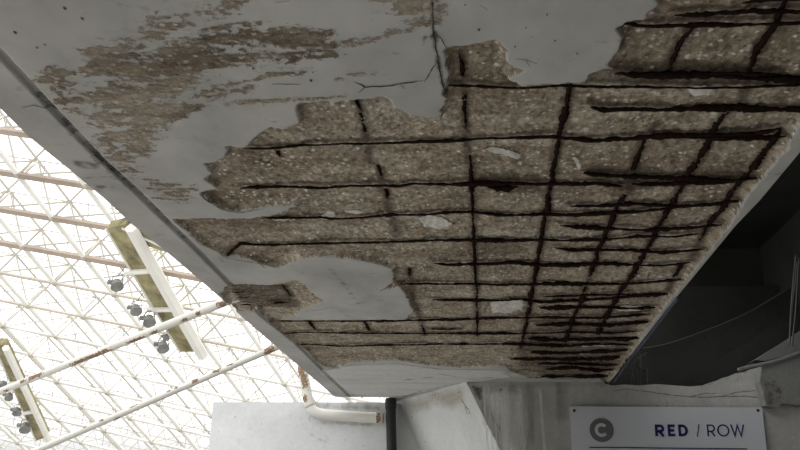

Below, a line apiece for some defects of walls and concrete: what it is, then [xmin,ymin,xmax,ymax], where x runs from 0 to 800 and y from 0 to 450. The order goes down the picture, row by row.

crack [355,0,446,97]
leakage [89,144,133,187]
spalling [173,0,800,384]